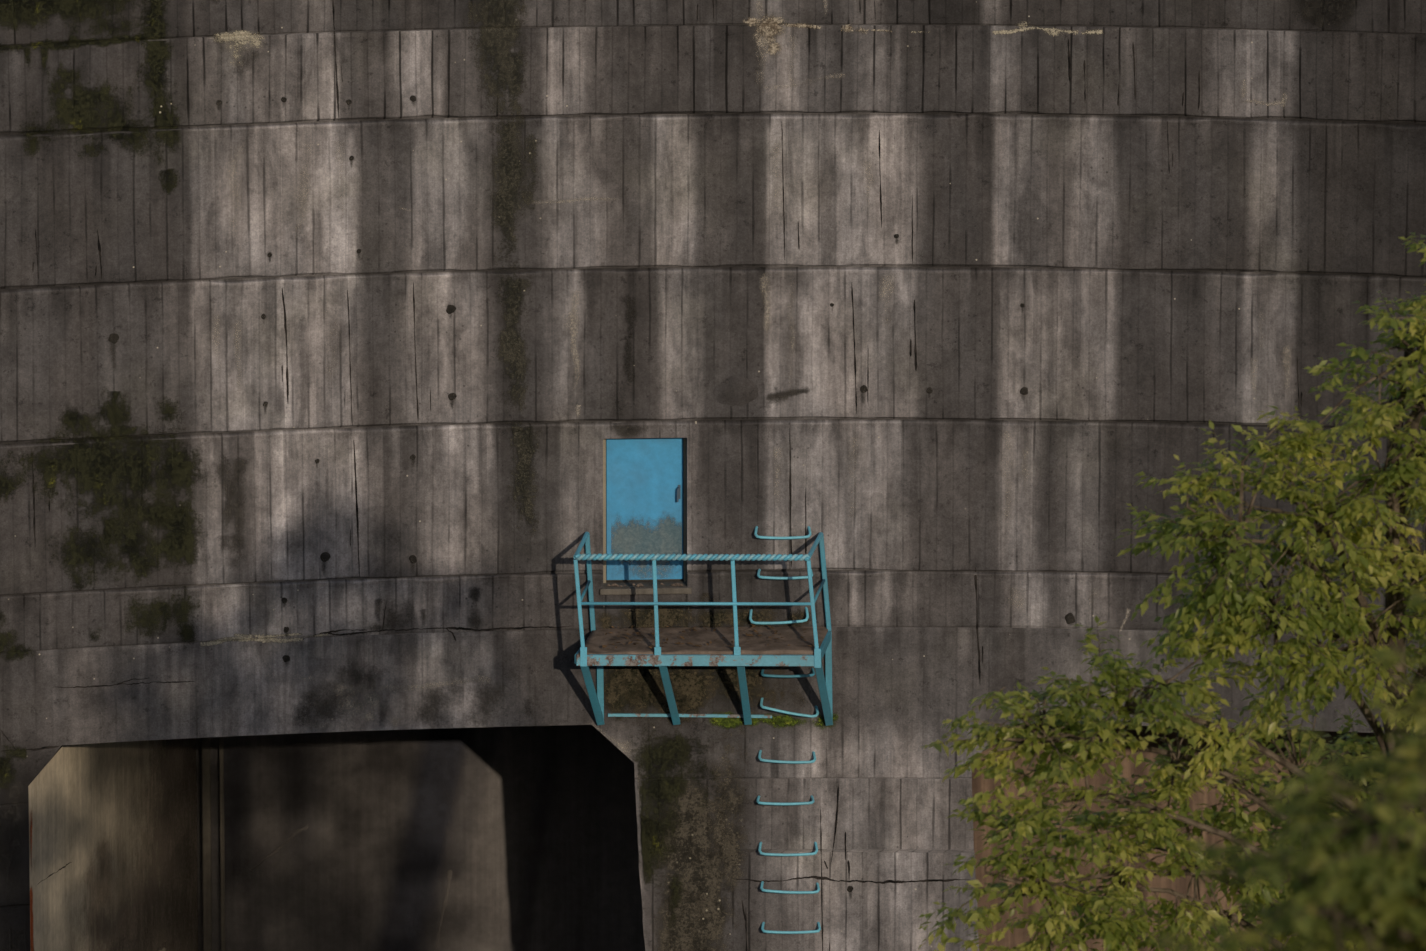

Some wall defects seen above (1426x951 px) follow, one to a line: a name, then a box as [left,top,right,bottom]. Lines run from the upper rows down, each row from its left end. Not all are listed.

damp [468,0,541,535]
peeling [611,516,682,577]
crack [52,678,194,688]
damp [655,734,745,951]
crack [733,785,970,951]